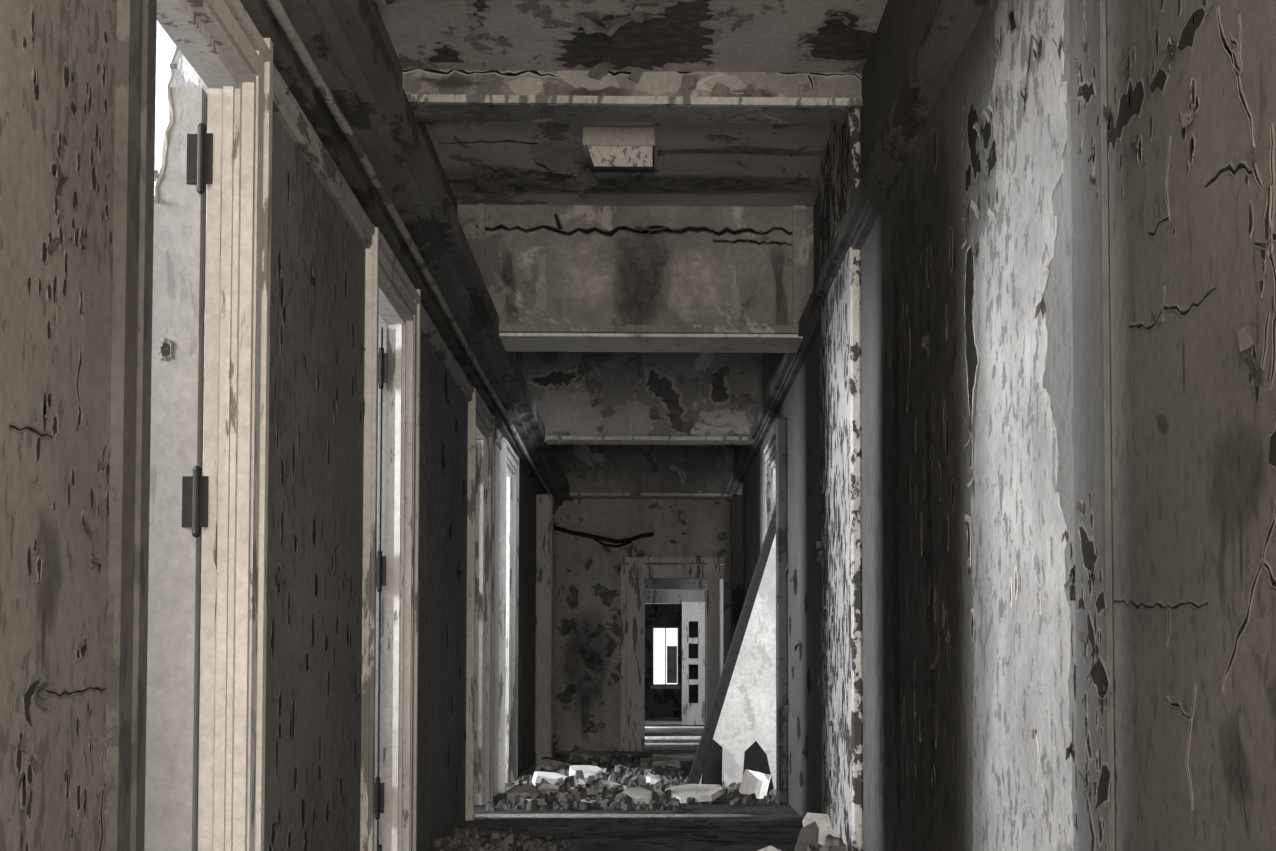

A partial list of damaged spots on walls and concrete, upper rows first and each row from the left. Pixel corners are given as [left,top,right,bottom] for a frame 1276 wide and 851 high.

flaking render [423,40,469,67]
flaking render [465,0,494,29]
peeling [507,0,756,97]
peeling [797,9,877,64]
crack [1204,5,1276,391]
crack [476,213,793,246]
crack [1129,284,1217,333]
peeling [524,367,695,443]
flaking render [699,364,732,406]
peeling [907,0,1213,851]